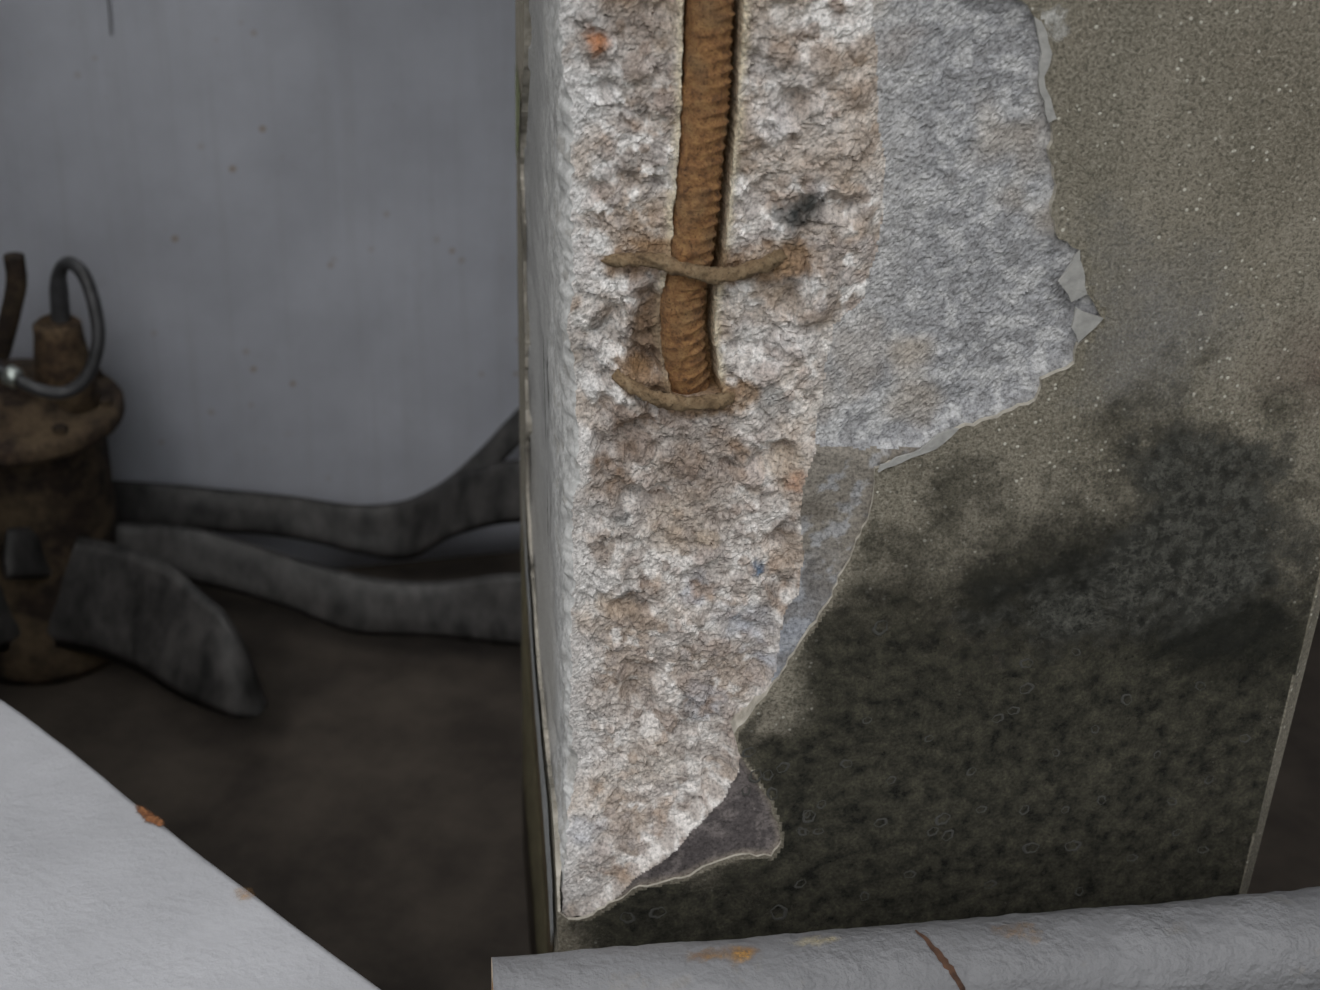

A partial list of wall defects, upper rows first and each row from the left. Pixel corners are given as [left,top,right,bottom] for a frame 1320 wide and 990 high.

spalling [524,0,1104,917]
crack [915,930,965,990]